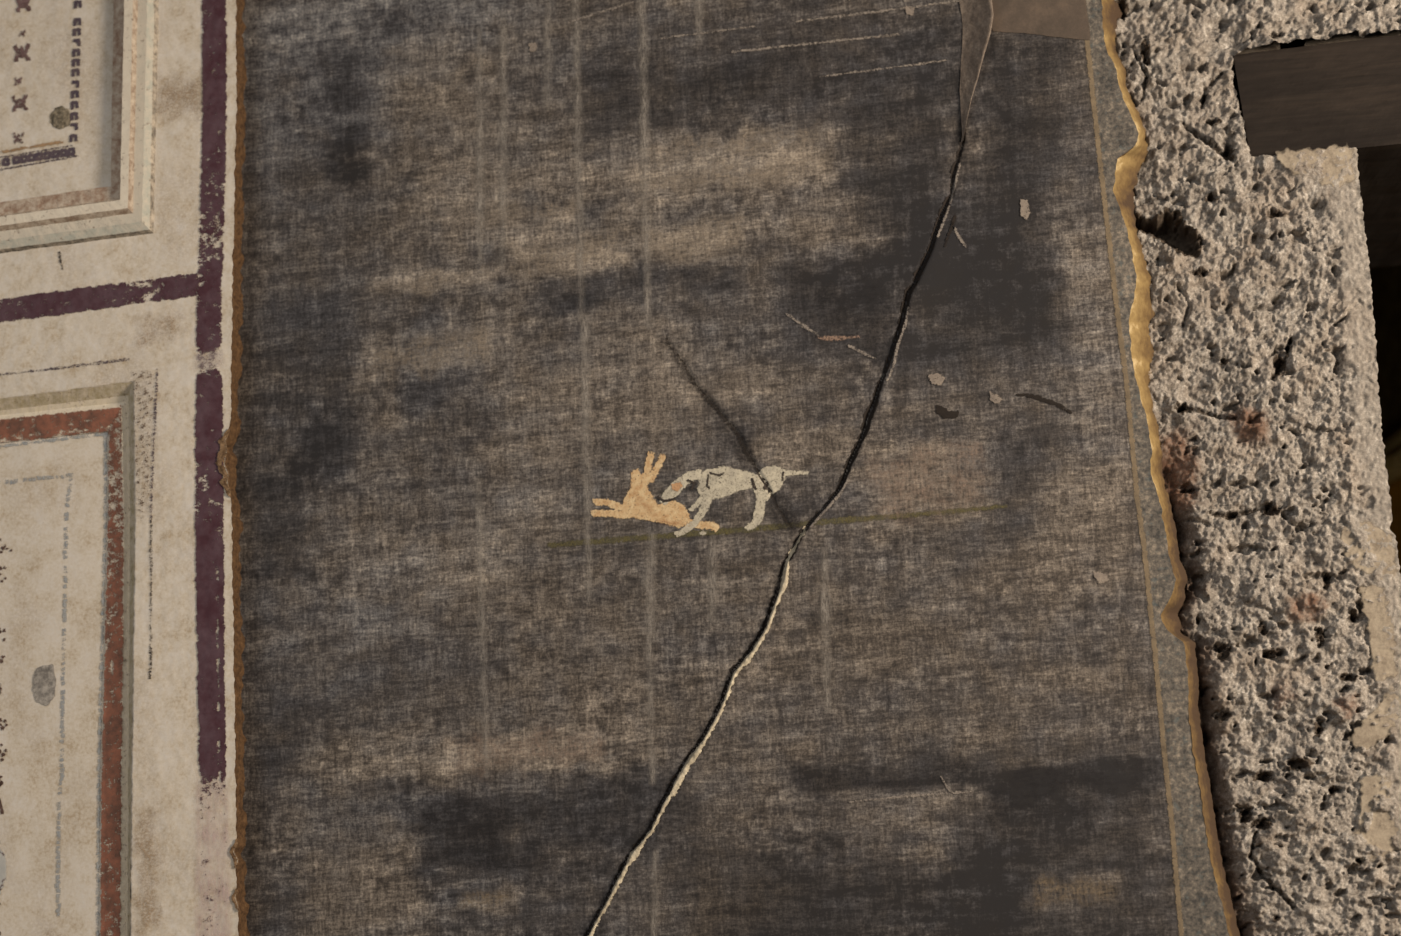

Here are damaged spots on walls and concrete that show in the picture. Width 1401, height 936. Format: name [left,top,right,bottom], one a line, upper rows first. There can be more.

spalling [1273,354,1287,376]
spalling [989,0,1240,936]
spalling [1262,503,1282,516]
crack [583,123,966,936]
spalling [1258,624,1282,659]
spalling [1315,626,1324,646]
spalling [1253,757,1315,782]
spalling [1239,808,1272,830]